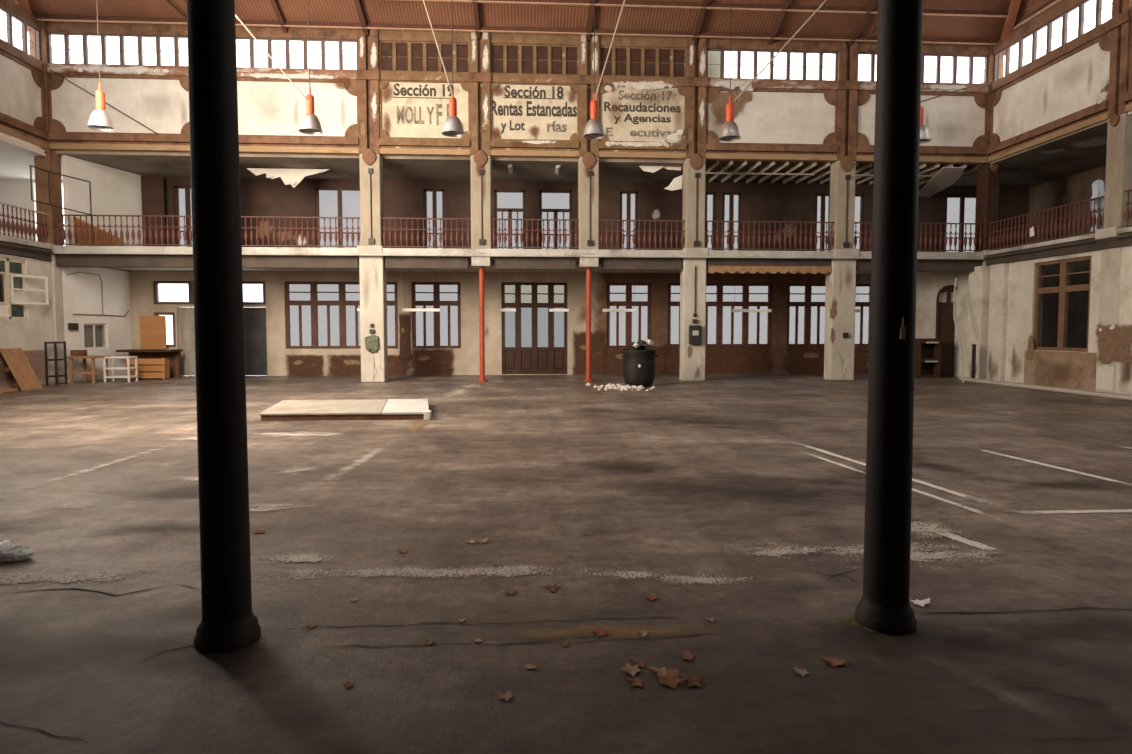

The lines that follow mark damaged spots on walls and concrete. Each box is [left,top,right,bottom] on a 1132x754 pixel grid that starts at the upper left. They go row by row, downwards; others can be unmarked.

peeling [689,45,705,75]
peeling [595,79,754,148]
flaking render [247,168,330,188]
flaking render [1095,322,1132,392]
crack [0,722,90,743]